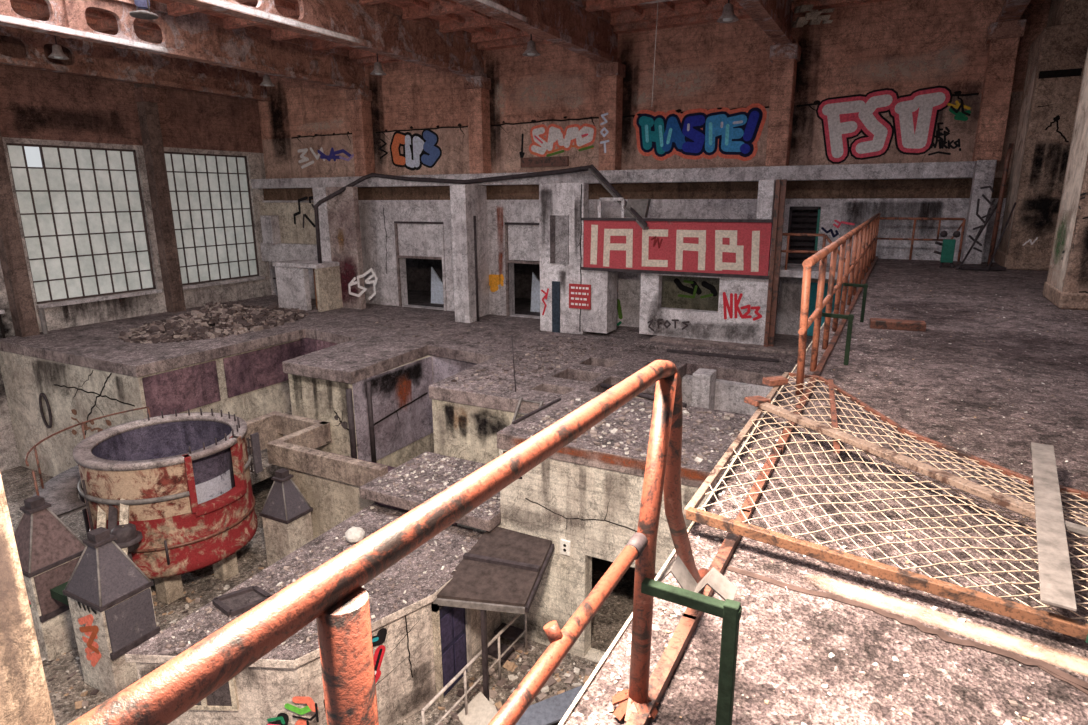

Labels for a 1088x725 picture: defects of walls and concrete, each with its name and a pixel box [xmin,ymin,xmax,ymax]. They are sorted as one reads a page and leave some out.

leakage [1024,144,1070,211]